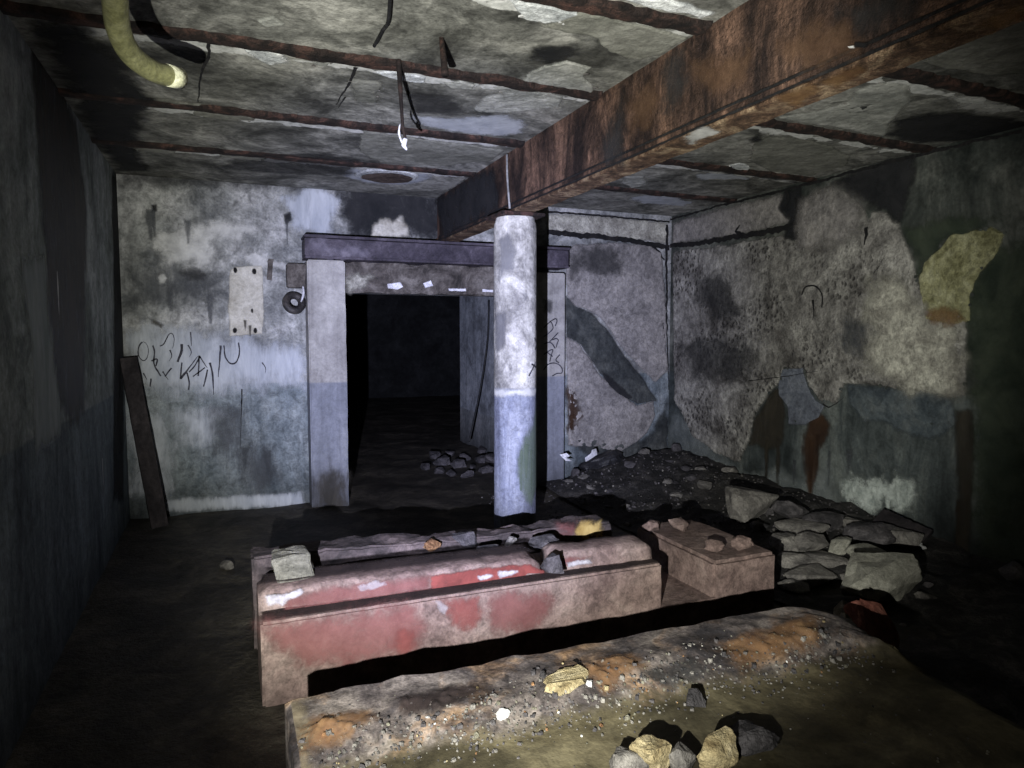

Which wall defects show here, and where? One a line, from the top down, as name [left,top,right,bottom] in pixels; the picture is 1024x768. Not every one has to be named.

peeling [473,0,690,60]
peeling [627,0,714,19]
peeling [133,34,598,113]
peeling [136,99,504,177]
corrosion [686,127,719,144]
damp [147,205,157,238]
peeling [371,217,408,238]
crack [548,129,1022,390]
damp [131,270,216,319]
flaking render [547,186,1007,462]
corrosion [565,389,582,430]
corrosion [802,415,829,493]